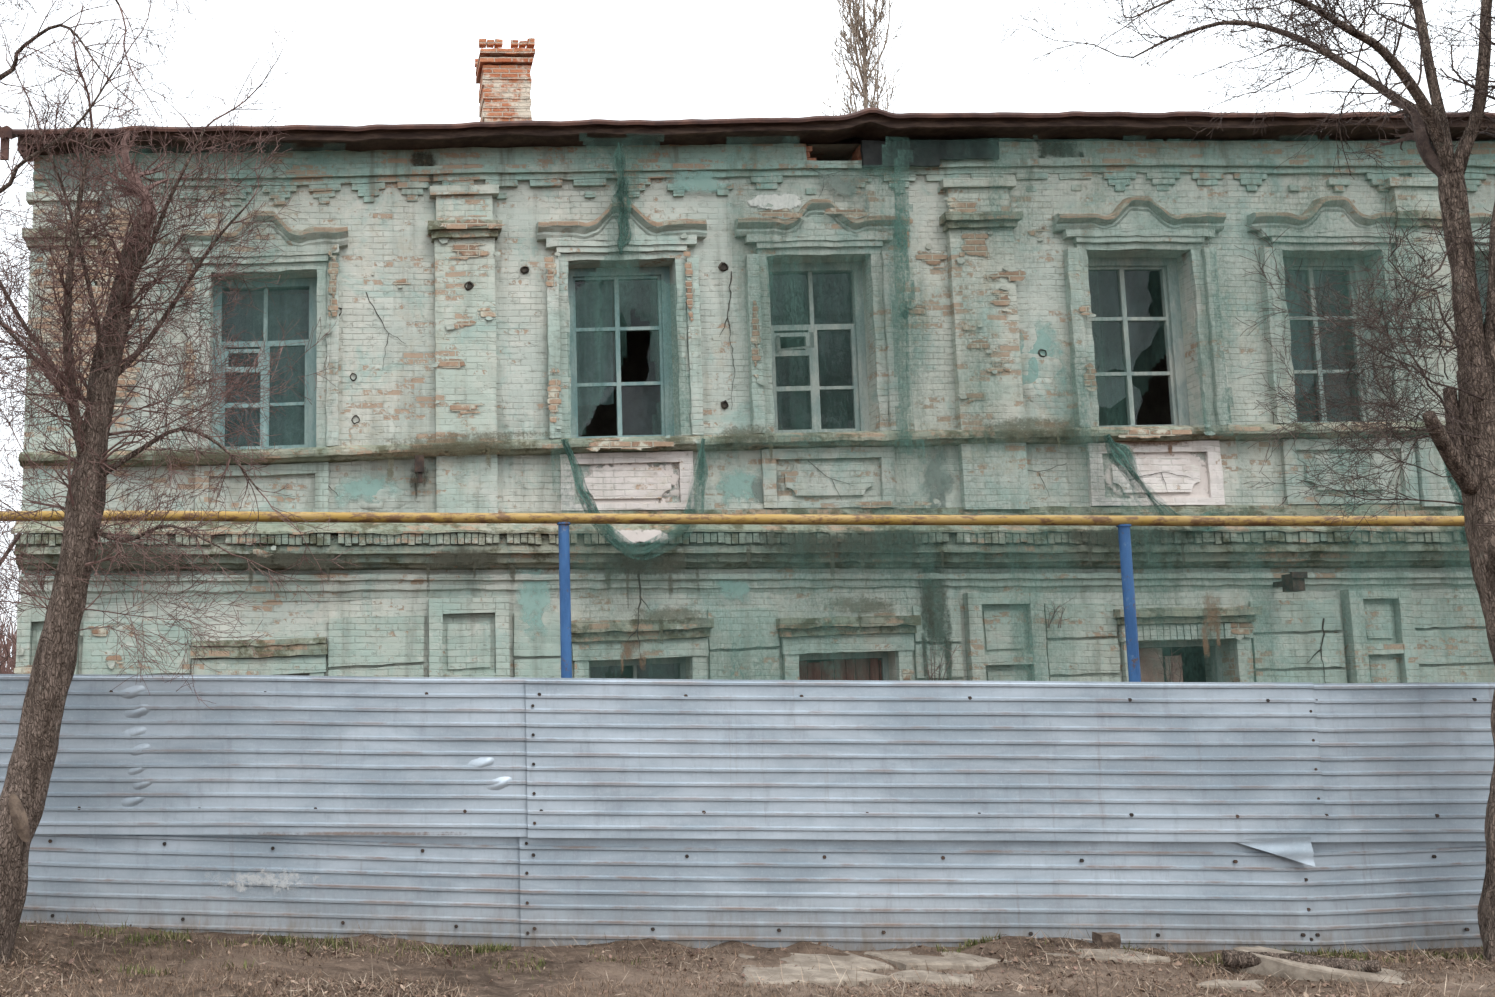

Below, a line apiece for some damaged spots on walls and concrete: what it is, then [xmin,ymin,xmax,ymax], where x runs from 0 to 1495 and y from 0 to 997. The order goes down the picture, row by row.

spalling [438,214,512,260]
spalling [753,203,878,221]
spalling [896,204,1037,311]
spalling [29,183,132,405]
spalling [112,284,146,428]
crack [366,292,406,366]
spalling [432,359,465,369]
spalling [436,400,485,414]
spalling [547,368,562,429]